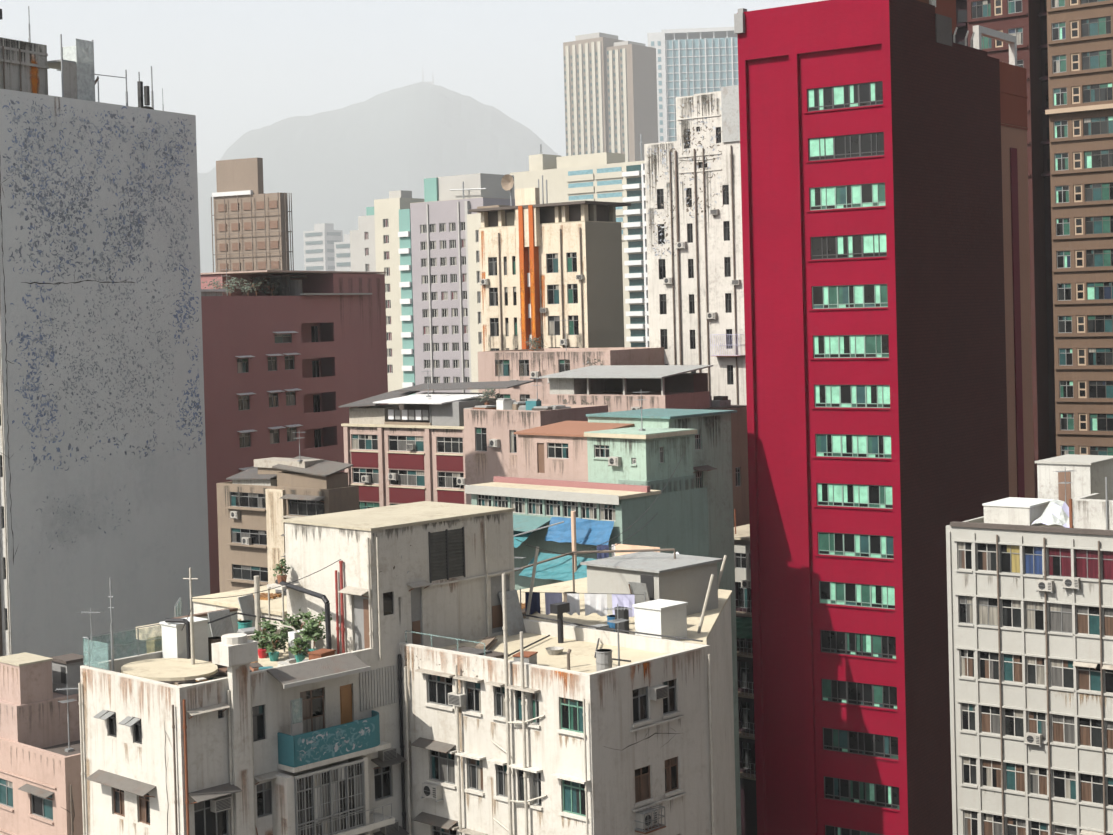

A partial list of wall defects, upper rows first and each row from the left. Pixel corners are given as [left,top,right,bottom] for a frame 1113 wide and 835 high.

crack [0,174,134,565]
peeling [2,95,203,472]
leakage [649,94,718,234]
peeling [297,720,375,764]